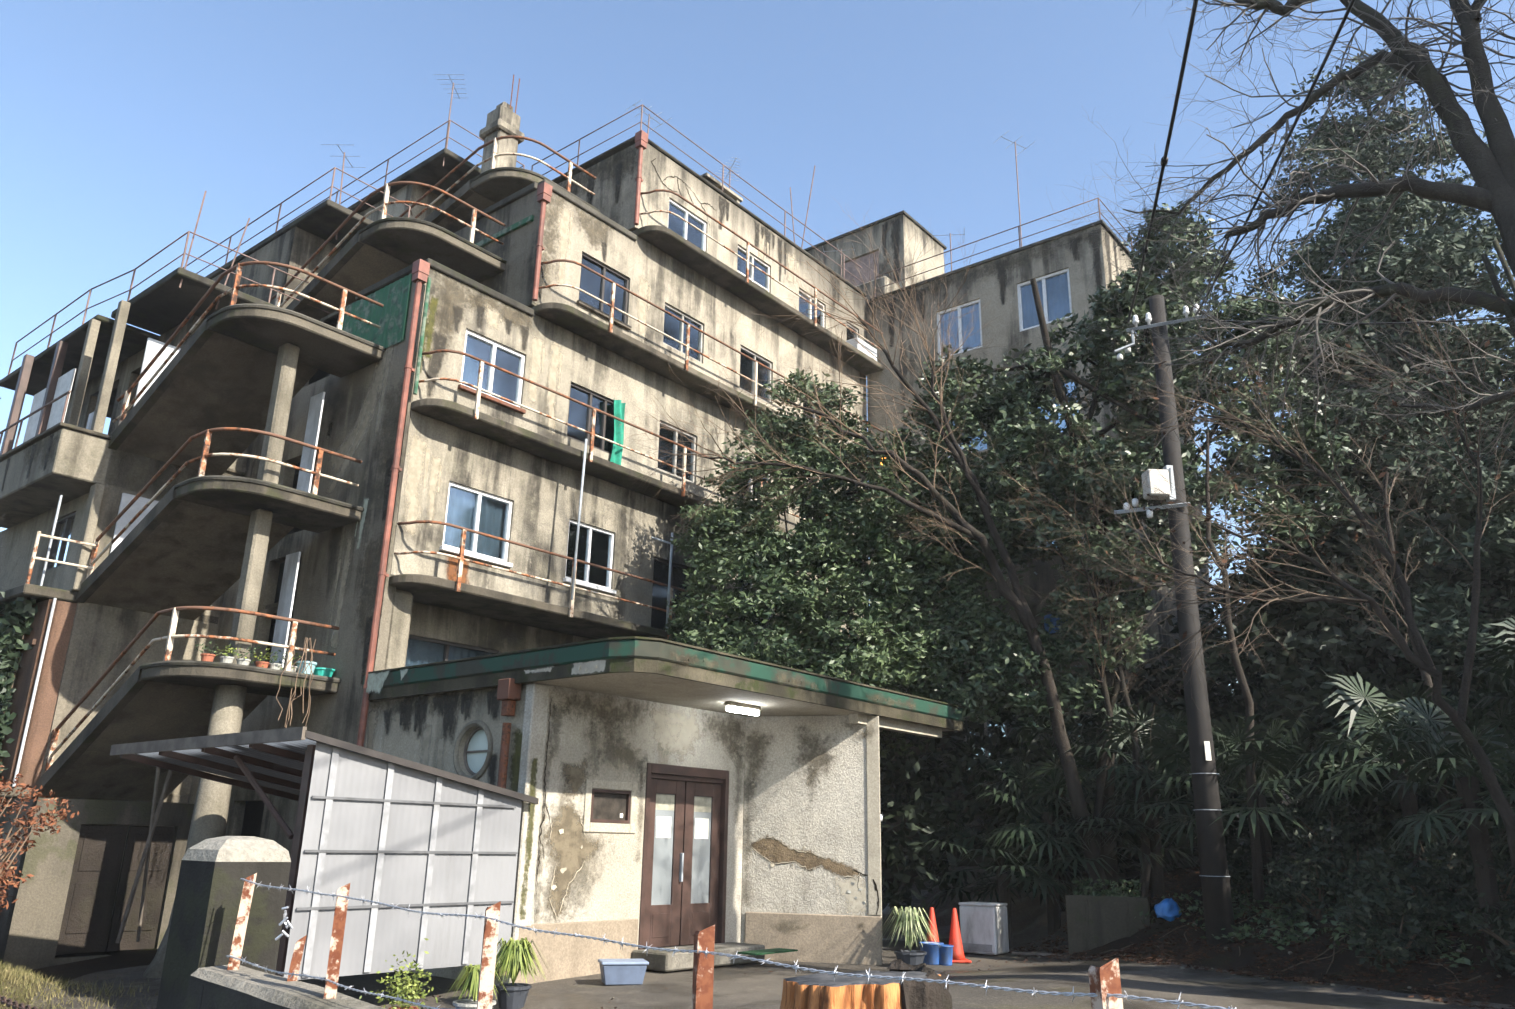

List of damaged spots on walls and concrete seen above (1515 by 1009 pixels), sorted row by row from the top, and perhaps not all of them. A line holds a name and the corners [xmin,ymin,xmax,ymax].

damp [719,196,730,230]
damp [638,277,651,338]
damp [754,221,799,283]
damp [831,275,840,310]
damp [870,218,1118,347]
rust [447,553,469,584]
damp [367,689,499,770]
damp [563,761,588,795]
damp [705,717,769,778]
damp [799,730,832,784]
peeling [751,836,868,913]